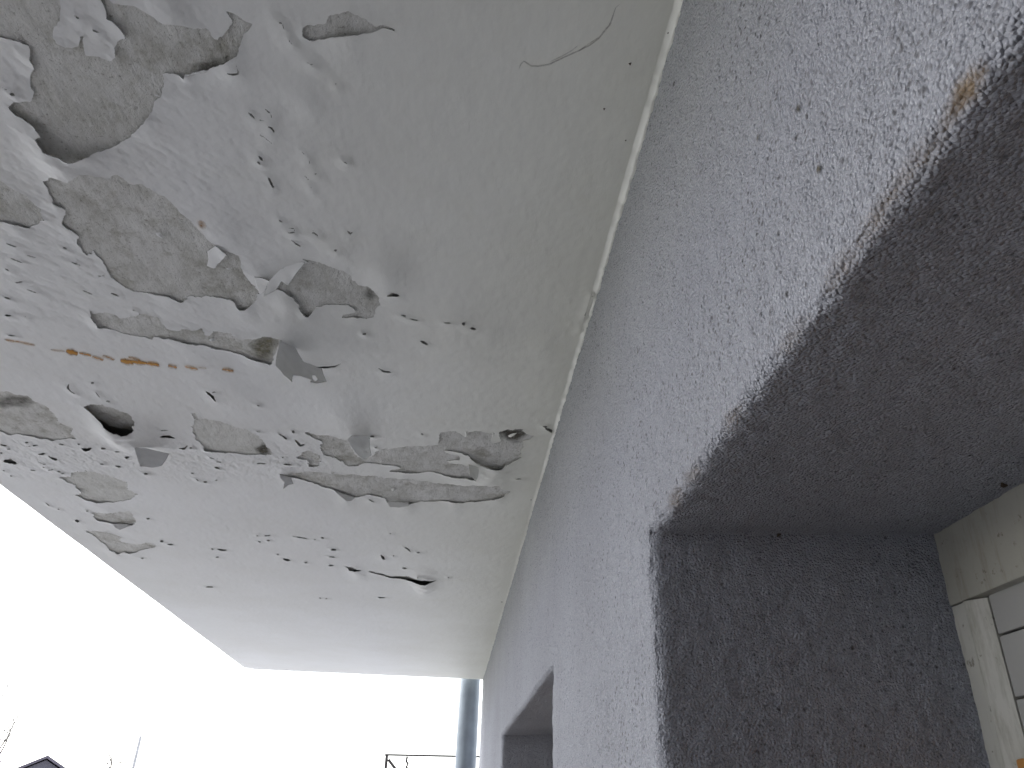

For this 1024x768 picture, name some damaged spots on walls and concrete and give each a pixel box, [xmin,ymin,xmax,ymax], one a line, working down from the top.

peeling [0,0,407,370]
rust [66,350,196,369]
peeling [0,385,181,560]
flaking render [181,408,555,508]
crack [204,529,455,600]